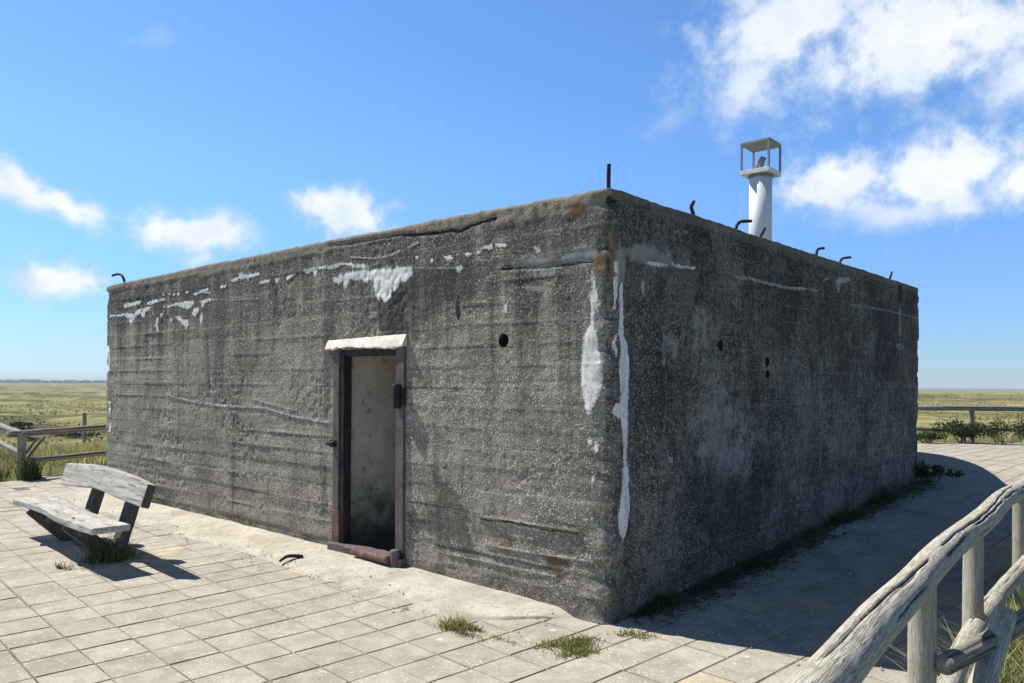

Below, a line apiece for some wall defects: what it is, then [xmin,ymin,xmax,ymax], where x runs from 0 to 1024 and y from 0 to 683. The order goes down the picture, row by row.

crack [382,217,497,239]
efflorescence [510,239,672,542]
crack [480,517,579,535]